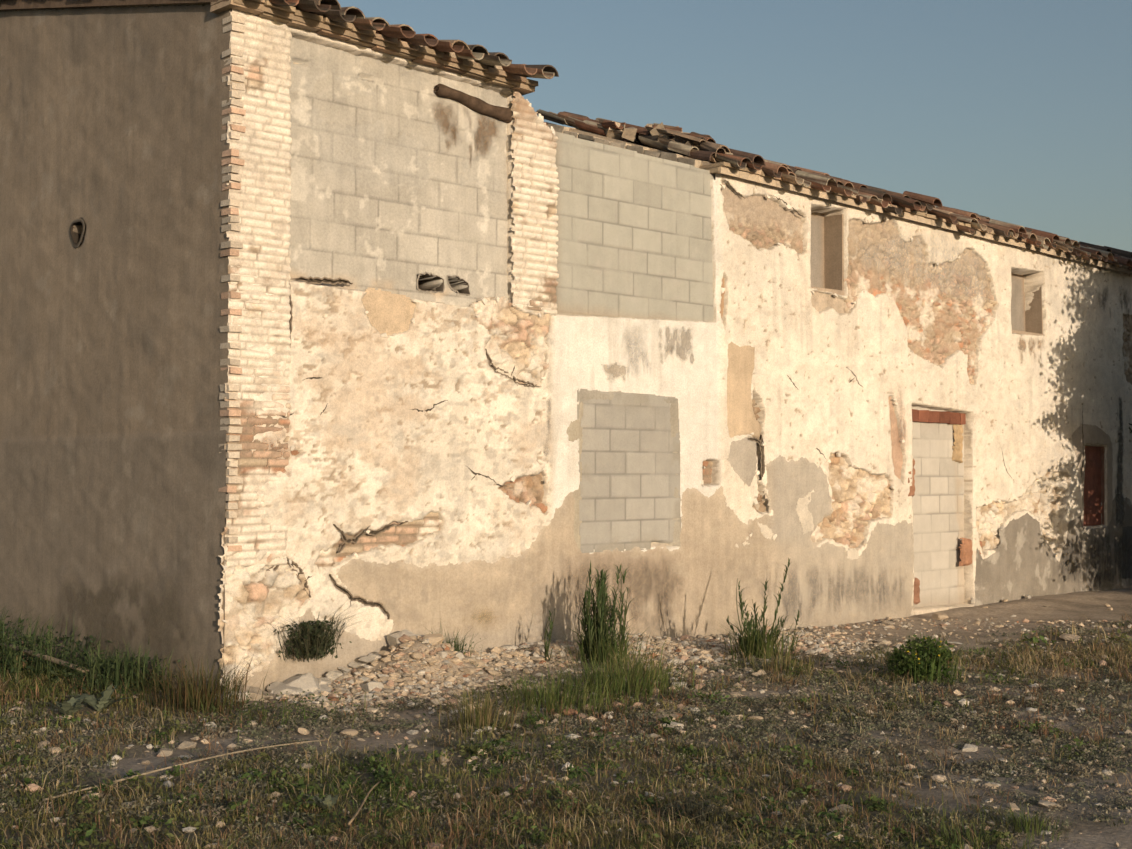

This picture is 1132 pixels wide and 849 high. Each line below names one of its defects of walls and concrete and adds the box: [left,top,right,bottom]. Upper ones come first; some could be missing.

flaking render [719,182,804,254]
flaking render [361,271,551,386]
flaking render [810,217,997,385]
flaking render [217,527,310,685]
crack [267,521,408,619]
flaking render [315,512,442,570]
flaking render [498,473,549,513]
flaking render [811,396,915,551]
flaking render [959,472,1069,566]
water stain [1062,539,1132,582]
water stain [1115,398,1124,525]